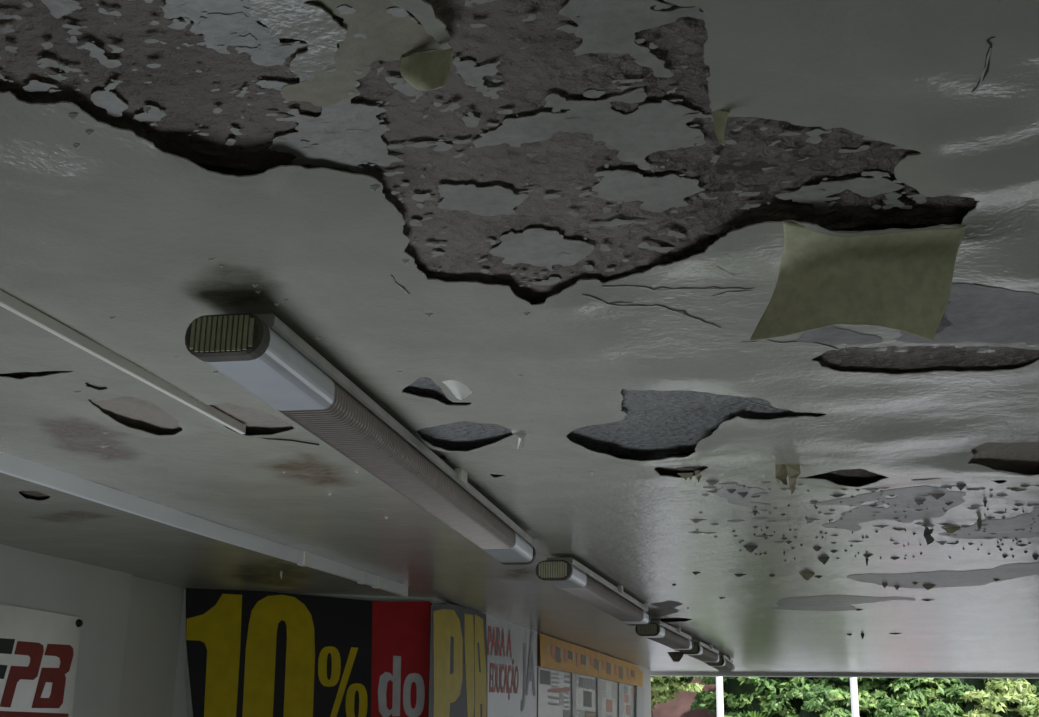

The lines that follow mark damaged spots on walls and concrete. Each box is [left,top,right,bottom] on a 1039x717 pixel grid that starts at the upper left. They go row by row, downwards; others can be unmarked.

crack [971,37,995,94]
peeling [0,0,1039,320]
peeling [797,283,1039,383]
peeling [74,383,310,448]
peeling [388,377,1039,611]